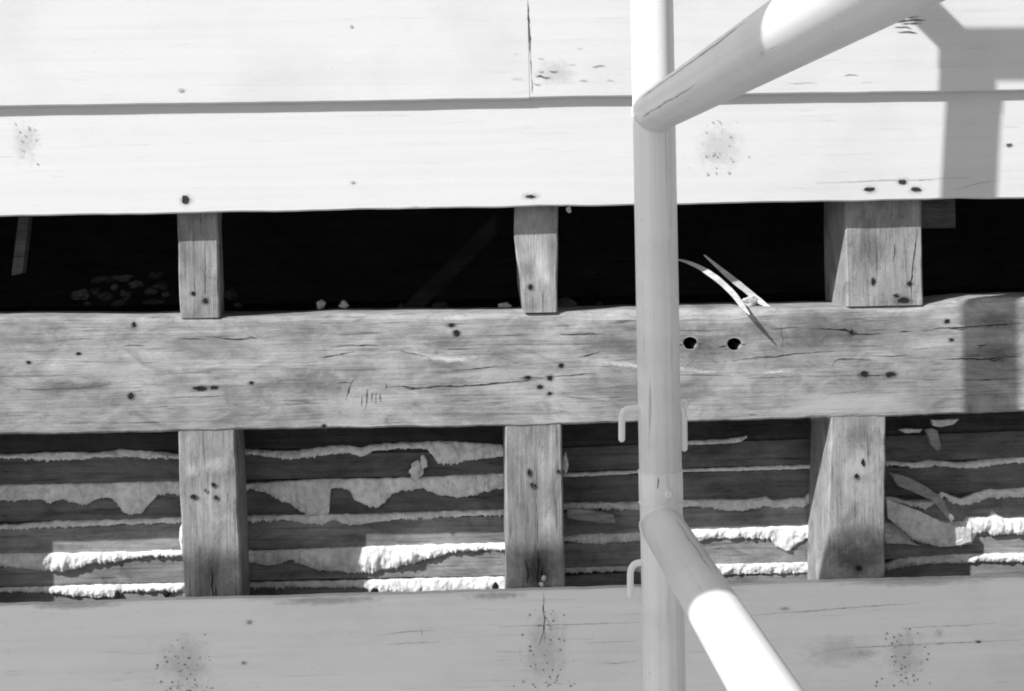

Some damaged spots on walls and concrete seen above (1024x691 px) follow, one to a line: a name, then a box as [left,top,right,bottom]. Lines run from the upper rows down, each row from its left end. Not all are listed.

crack [525,8,533,93]
crack [500,445,640,664]